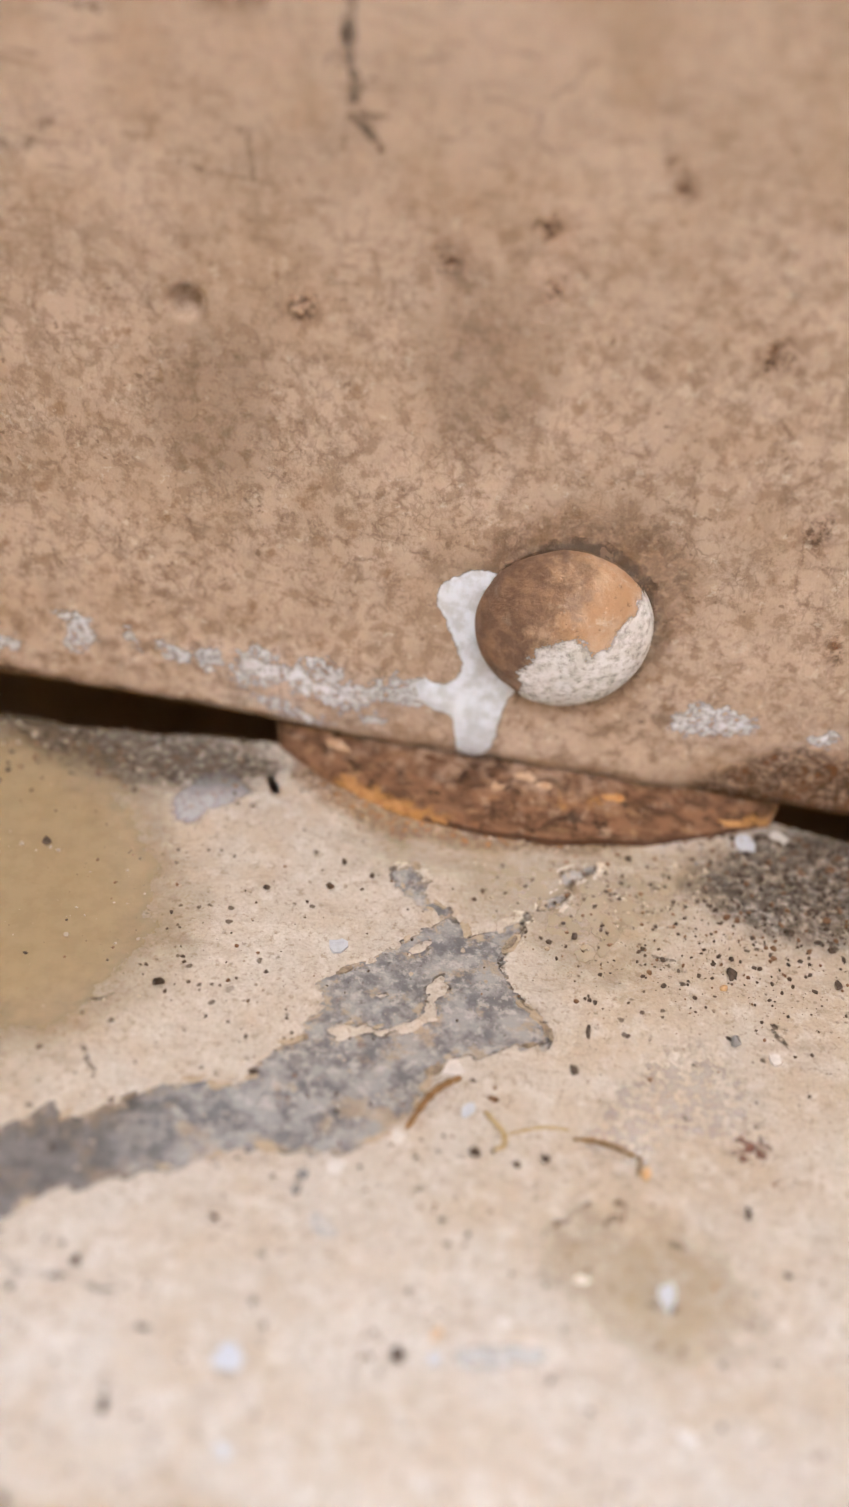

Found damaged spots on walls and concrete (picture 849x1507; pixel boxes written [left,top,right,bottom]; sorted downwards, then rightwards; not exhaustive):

crack [340,0,383,153]
peeling [0,861,598,1220]